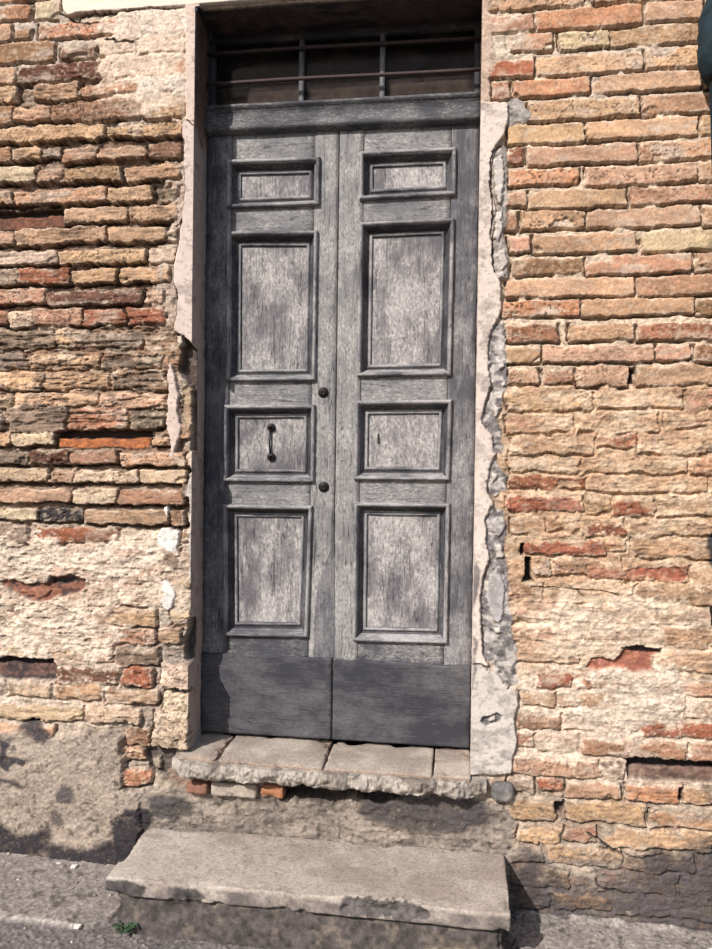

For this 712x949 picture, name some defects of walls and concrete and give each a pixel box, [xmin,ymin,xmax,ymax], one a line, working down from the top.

peeling [491,145,510,283]
flaking render [177,333,197,451]
peeling [480,320,519,690]
spalling [0,573,87,603]
spalling [0,656,58,682]
spalling [586,645,662,673]
peeling [480,713,503,726]
spalling [339,896,430,921]